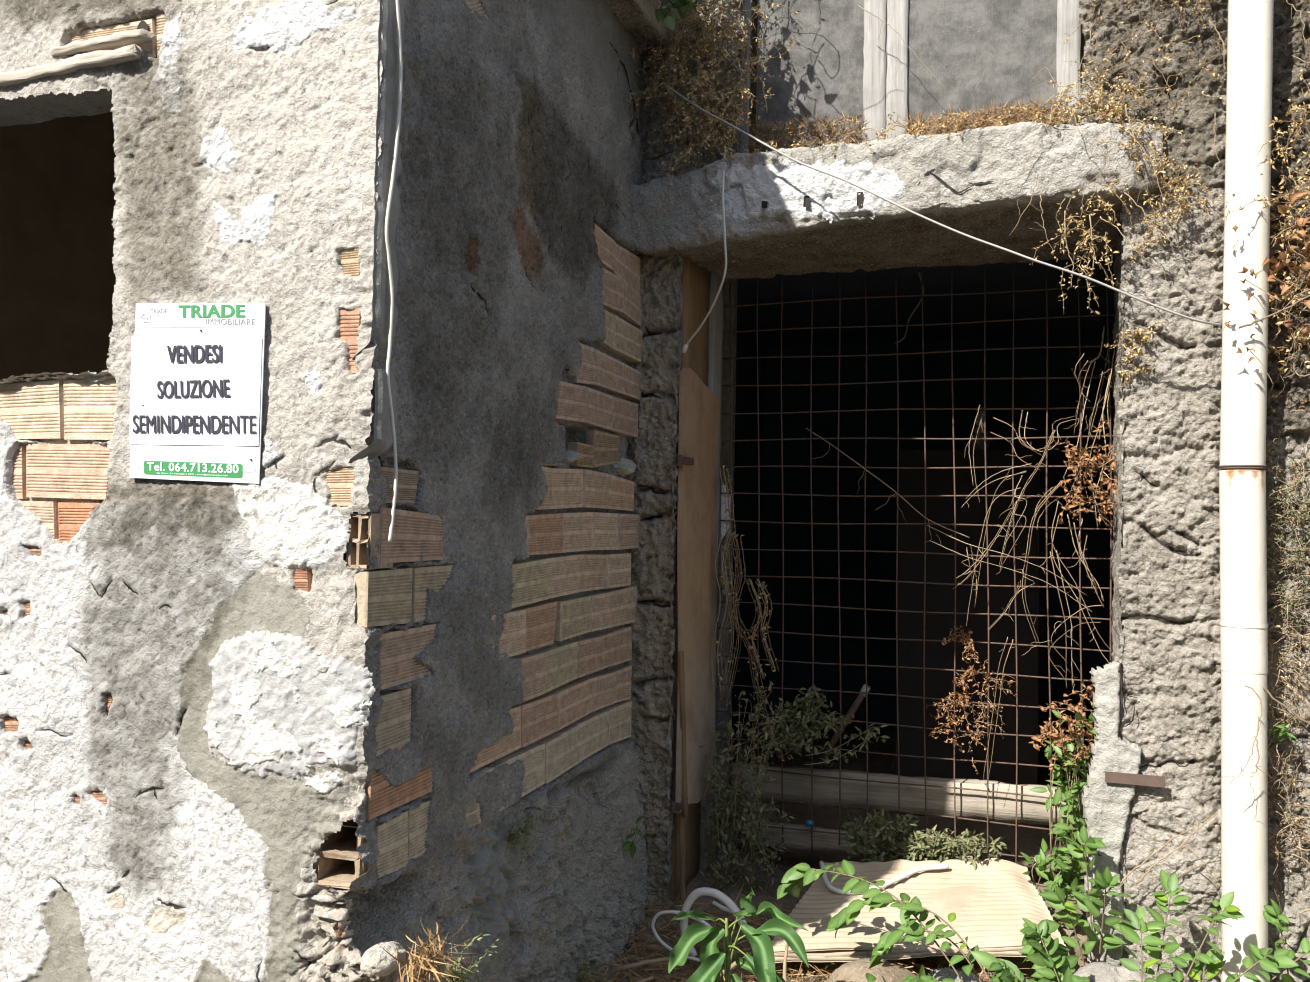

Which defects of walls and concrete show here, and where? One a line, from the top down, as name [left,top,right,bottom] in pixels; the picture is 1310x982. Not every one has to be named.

peeling [68,0,186,117]
peeling [232,0,355,53]
spalling [340,249,360,277]
spalling [339,307,361,374]
spalling [0,379,118,544]
spalling [26,546,42,556]
spalling [466,223,642,828]
peeling [23,884,93,982]
peeling [147,907,186,934]